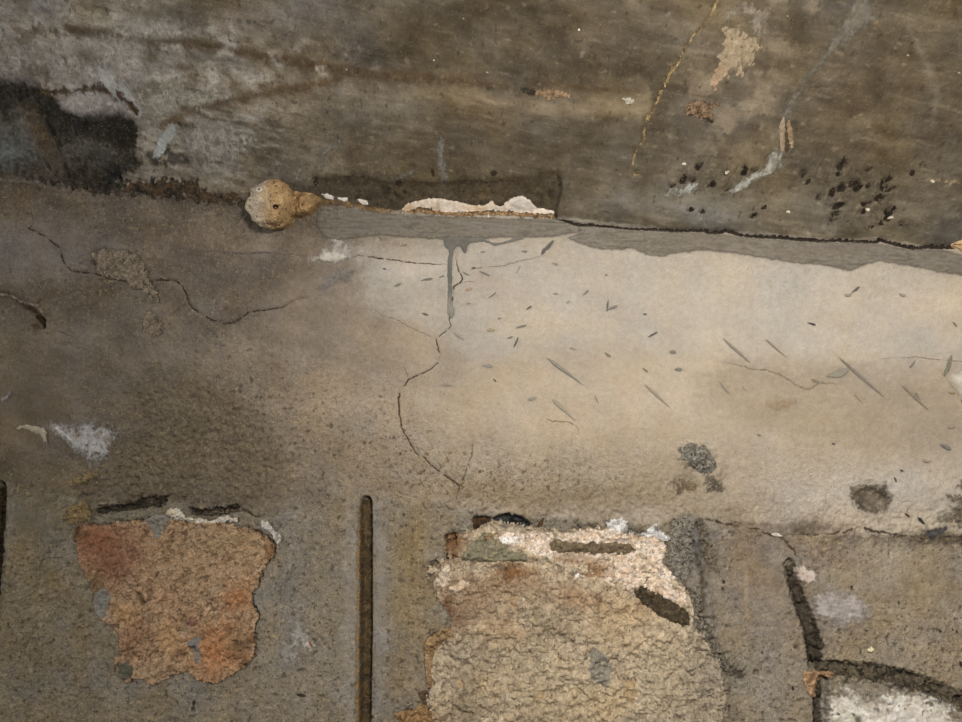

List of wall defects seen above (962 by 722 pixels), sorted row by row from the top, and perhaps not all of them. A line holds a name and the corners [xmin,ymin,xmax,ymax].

damp [0,18,257,208]
crack [631,0,719,176]
crack [28,211,128,283]
damp [313,137,560,210]
peeling [402,196,555,219]
crack [554,174,962,250]
crack [0,293,72,337]
crack [151,278,303,325]
crack [183,248,540,499]
spalling [74,515,275,686]
spalling [395,519,729,722]
damp [825,687,955,722]